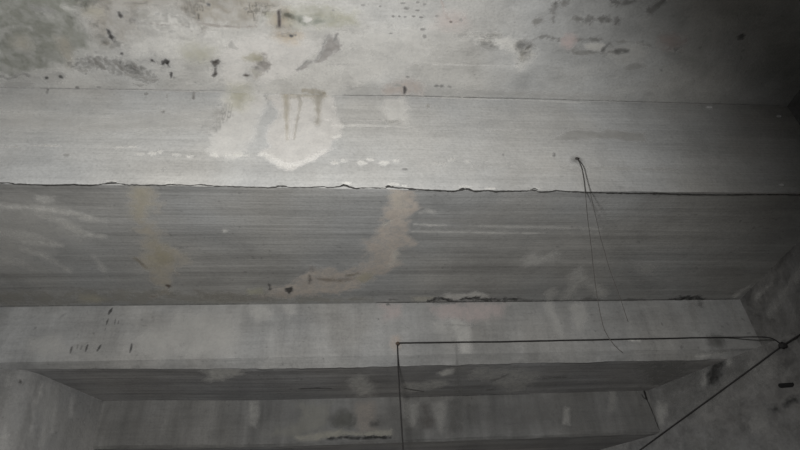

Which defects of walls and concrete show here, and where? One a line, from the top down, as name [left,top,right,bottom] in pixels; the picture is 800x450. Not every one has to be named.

leakage [5,87,343,170]
corrosion [283,89,326,139]
crack [0,180,800,195]
spalling [416,291,532,304]